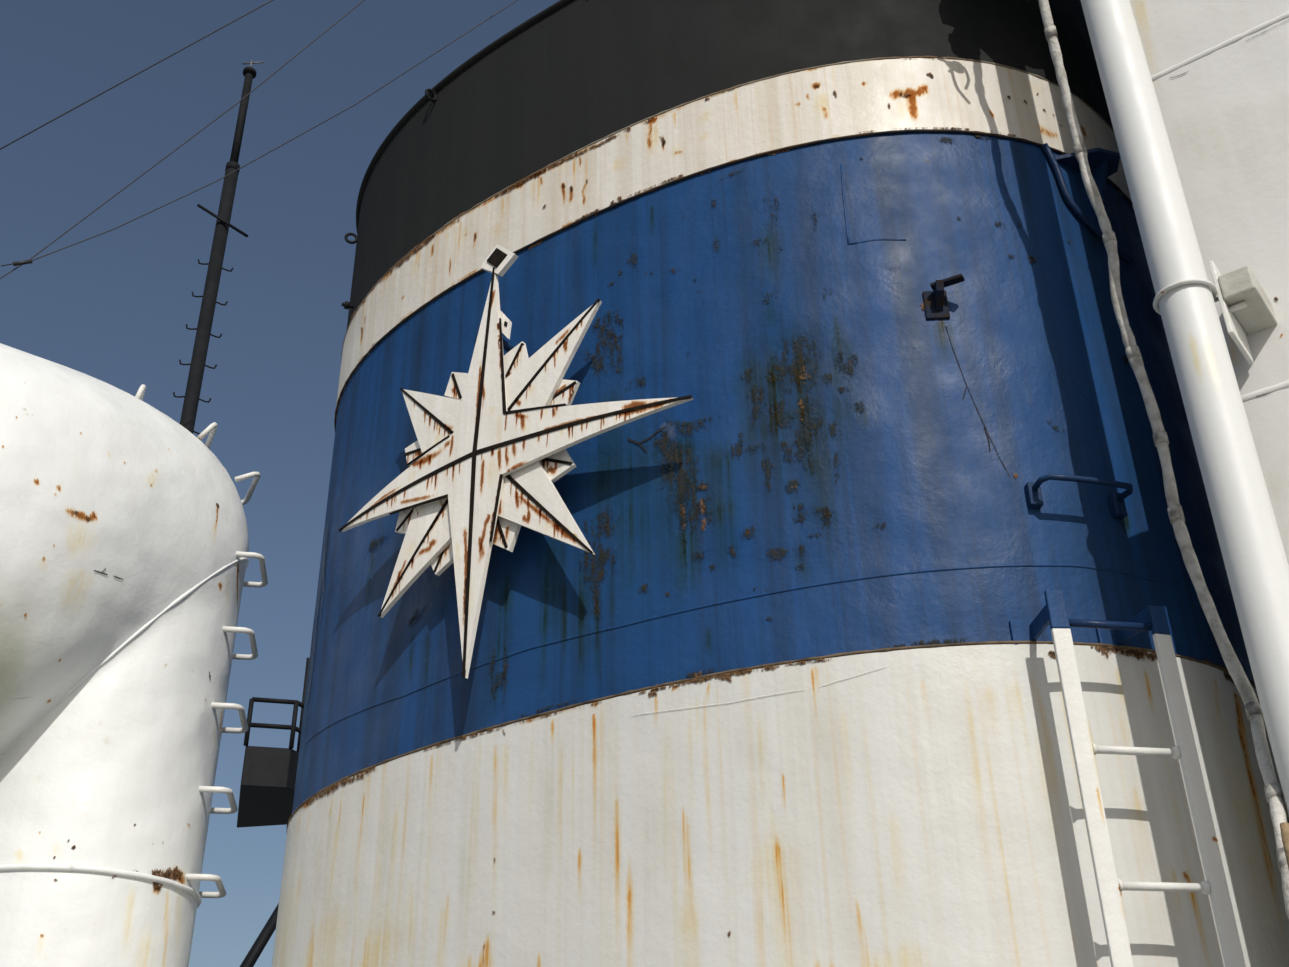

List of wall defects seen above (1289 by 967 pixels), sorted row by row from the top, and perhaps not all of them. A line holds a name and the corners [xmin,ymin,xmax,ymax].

corrosion [888,58,970,130]
corrosion [350,116,683,359]
corrosion [67,509,97,521]
corrosion [888,637,967,647]
corrosion [1091,645,1157,661]
corrosion [639,658,832,697]
corrosion [424,701,601,751]
corrosion [133,866,185,891]